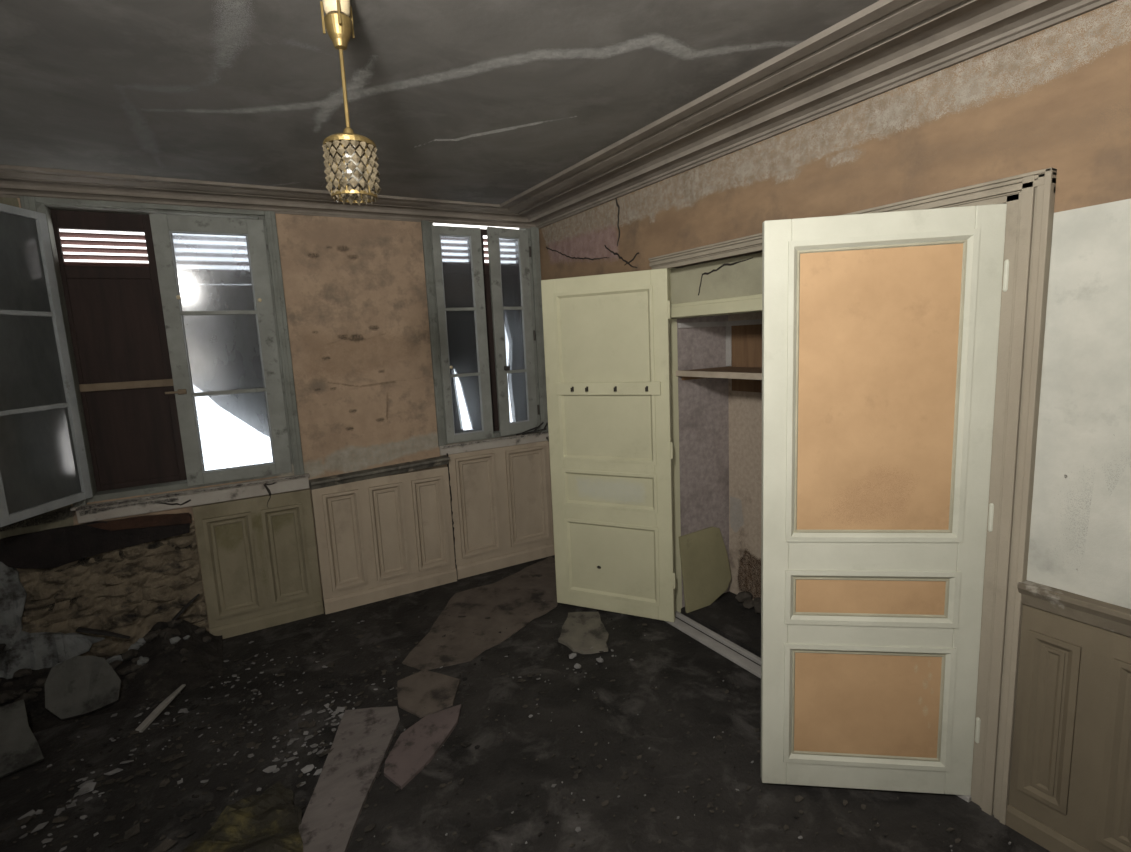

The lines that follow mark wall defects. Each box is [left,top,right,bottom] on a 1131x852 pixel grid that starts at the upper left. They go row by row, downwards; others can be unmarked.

crack [141,32,804,133]
crack [417,116,577,147]
crack [546,198,639,268]
crack [698,257,753,295]
spalling [0,513,209,679]